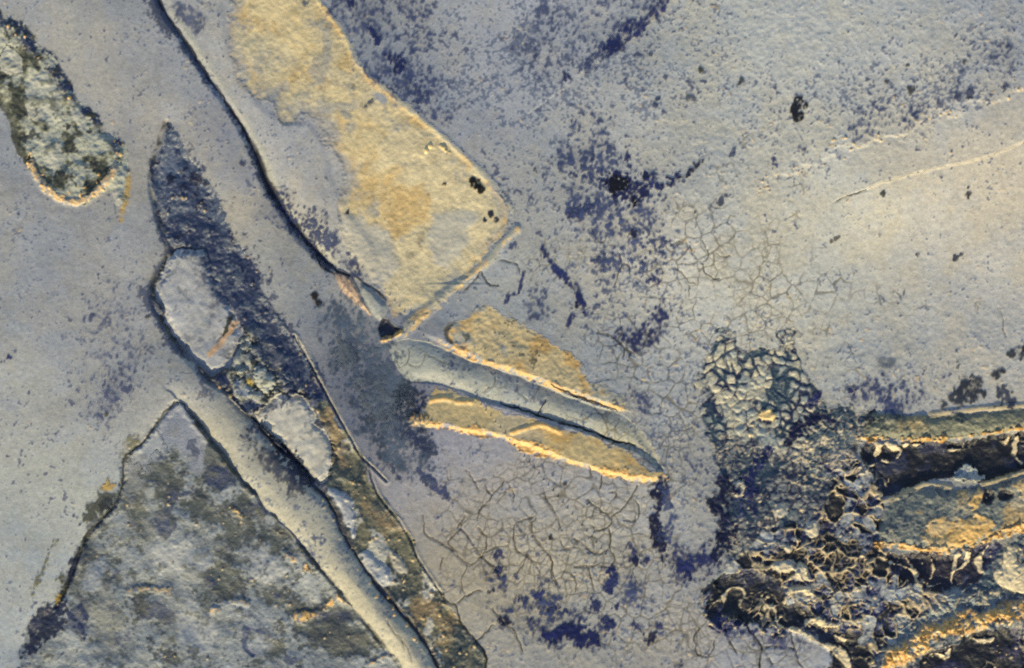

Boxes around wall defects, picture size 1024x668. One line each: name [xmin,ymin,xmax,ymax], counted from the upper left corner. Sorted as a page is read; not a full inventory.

spalling [0,10,131,210]
spalling [145,123,488,668]
crack [486,380,635,446]
spalling [20,403,402,668]
crack [416,467,639,668]
crack [693,616,803,668]